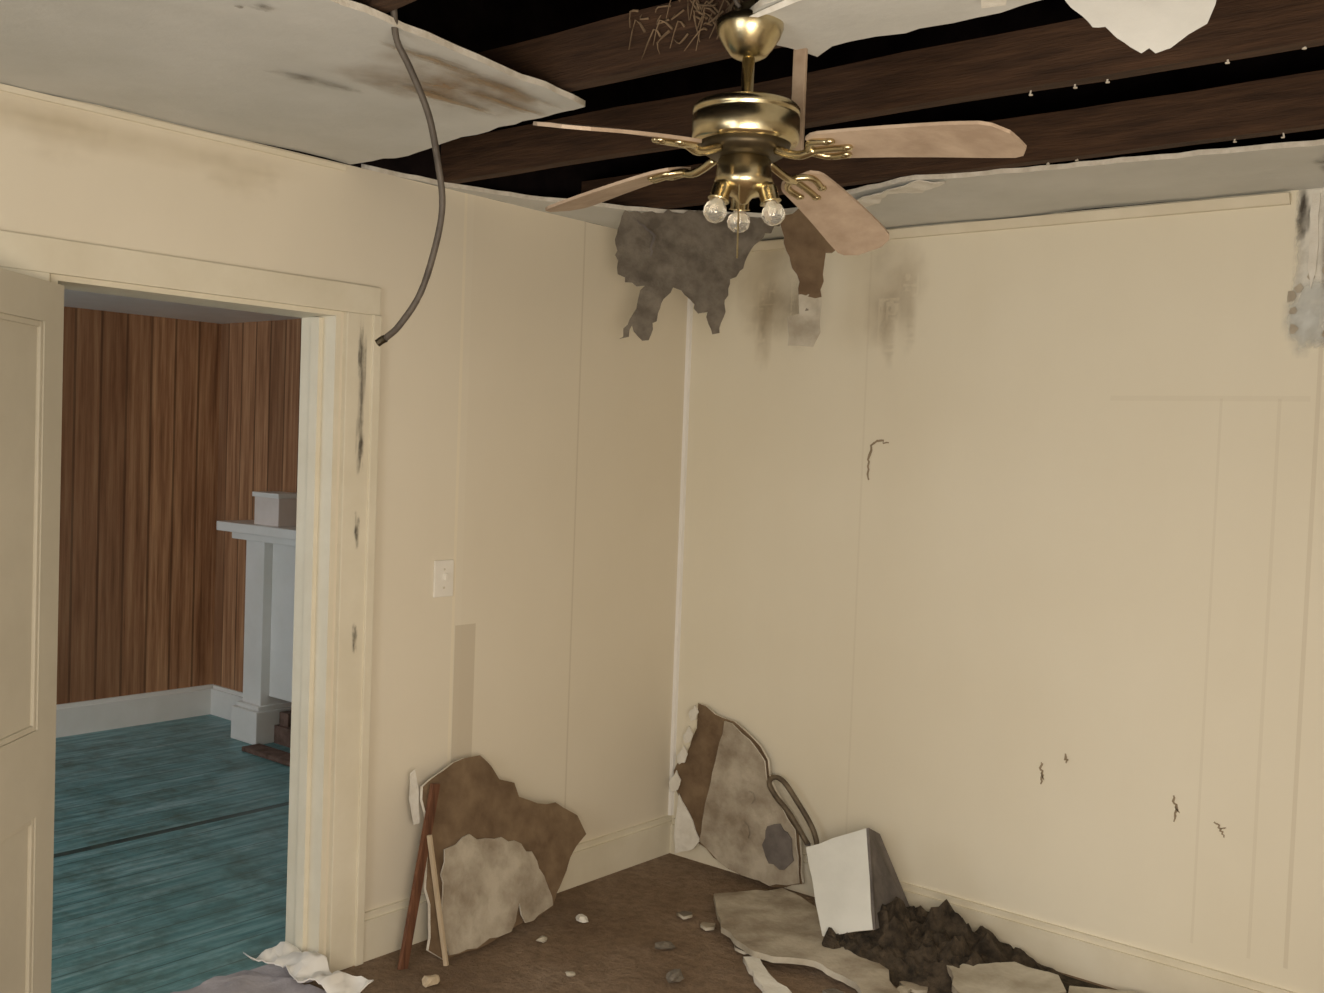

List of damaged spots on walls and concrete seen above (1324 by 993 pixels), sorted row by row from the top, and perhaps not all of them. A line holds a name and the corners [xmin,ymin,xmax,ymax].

peeling [1287,188,1324,347]
crack [867,439,889,480]